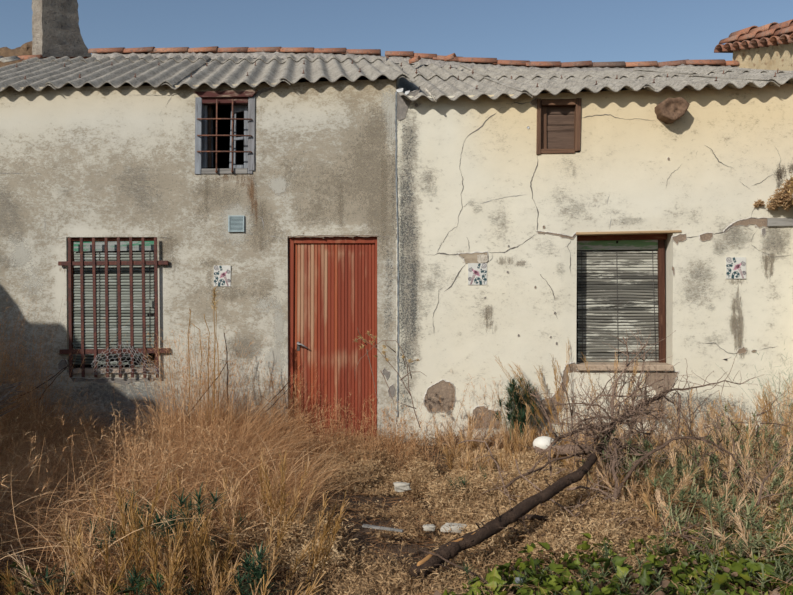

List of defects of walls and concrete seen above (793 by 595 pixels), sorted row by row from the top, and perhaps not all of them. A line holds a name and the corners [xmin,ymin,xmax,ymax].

crack [433,102,539,327]
spalling [671,217,769,245]
water stain [384,125,420,411]
spalling [458,251,489,264]
spalling [423,379,456,414]